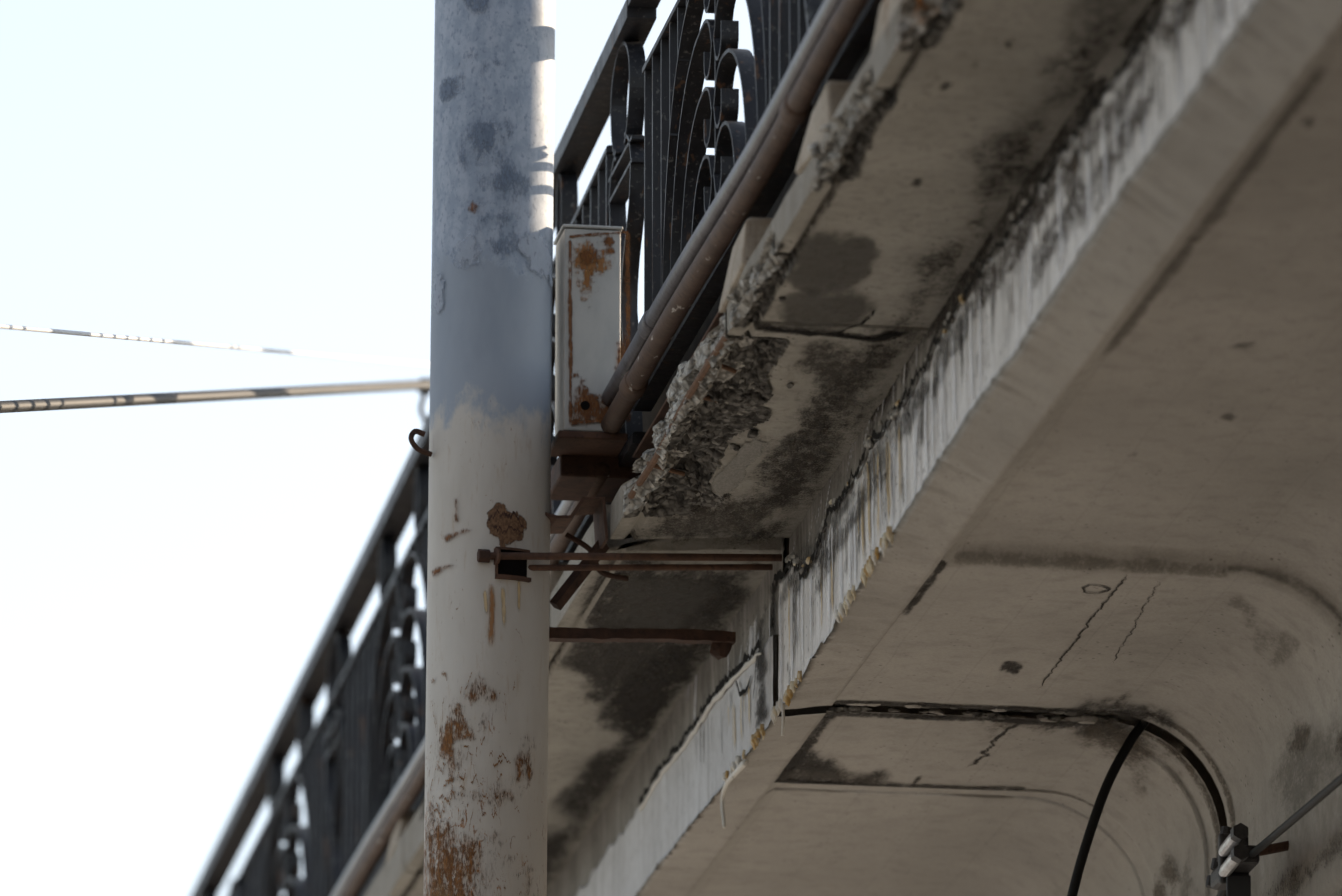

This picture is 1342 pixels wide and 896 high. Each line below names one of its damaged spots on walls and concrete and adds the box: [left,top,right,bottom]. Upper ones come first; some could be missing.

rust [425,672,533,896]
peeling [487,502,527,547]
leakage [549,560,749,738]
spalling [622,233,796,518]
leakage [631,166,876,545]
spalling [807,67,897,192]
crack [747,0,1165,587]
leakage [722,0,1247,783]
leakage [1109,76,1319,350]